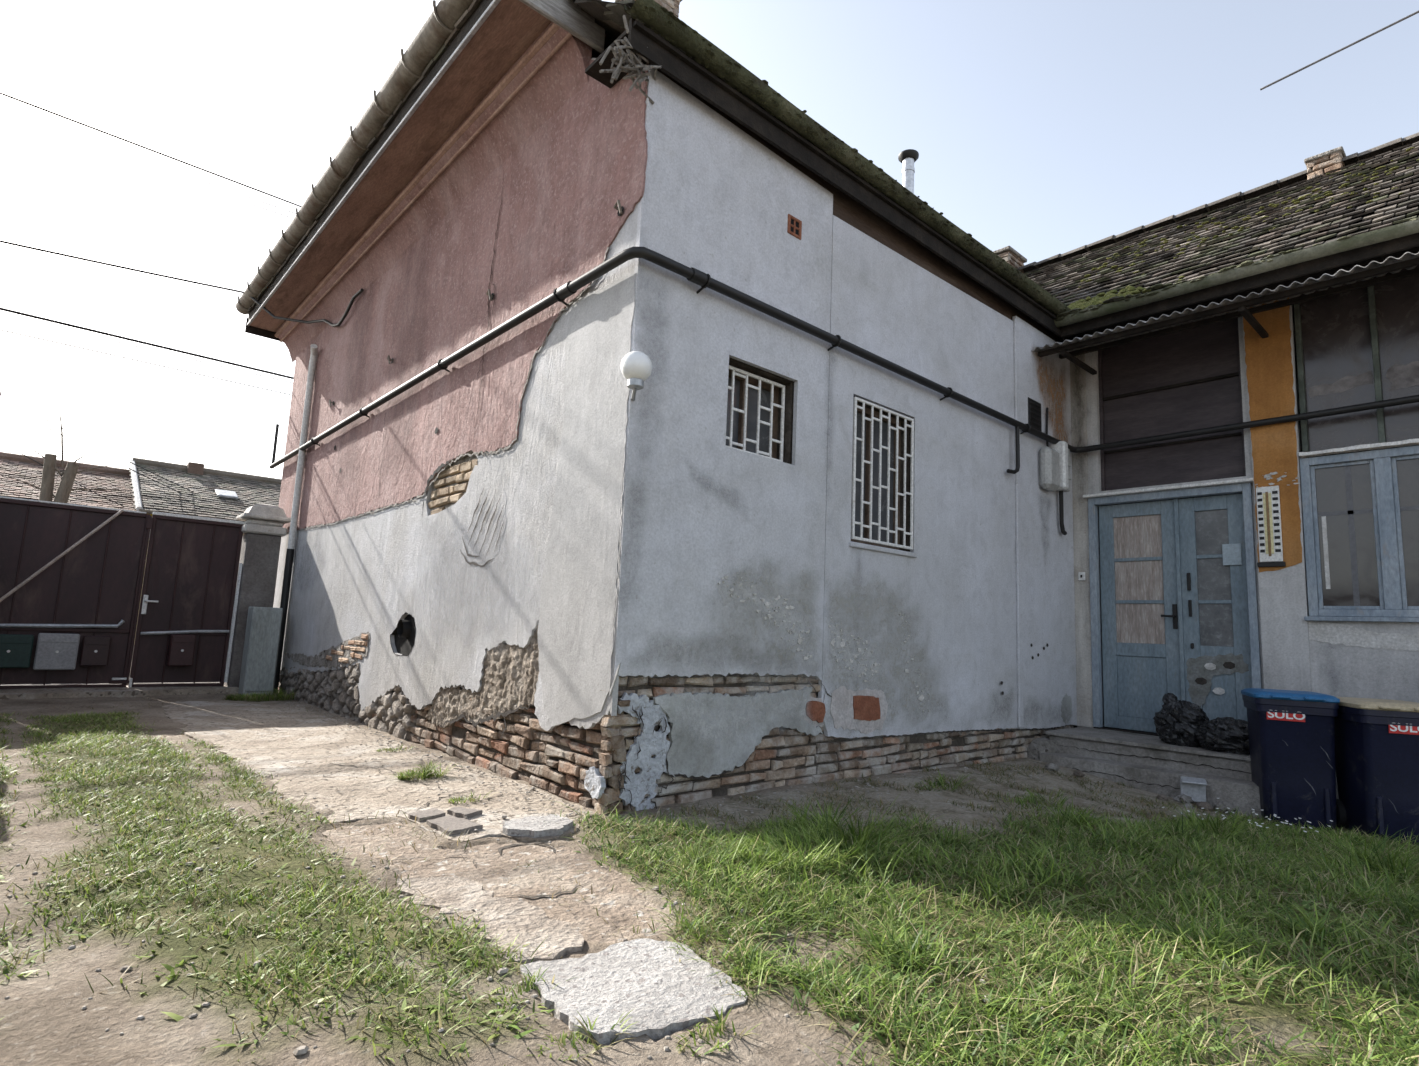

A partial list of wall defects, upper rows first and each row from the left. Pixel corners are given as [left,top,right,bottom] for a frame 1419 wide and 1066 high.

spalling [299,281,593,531]
flaking render [372,572,1074,815]